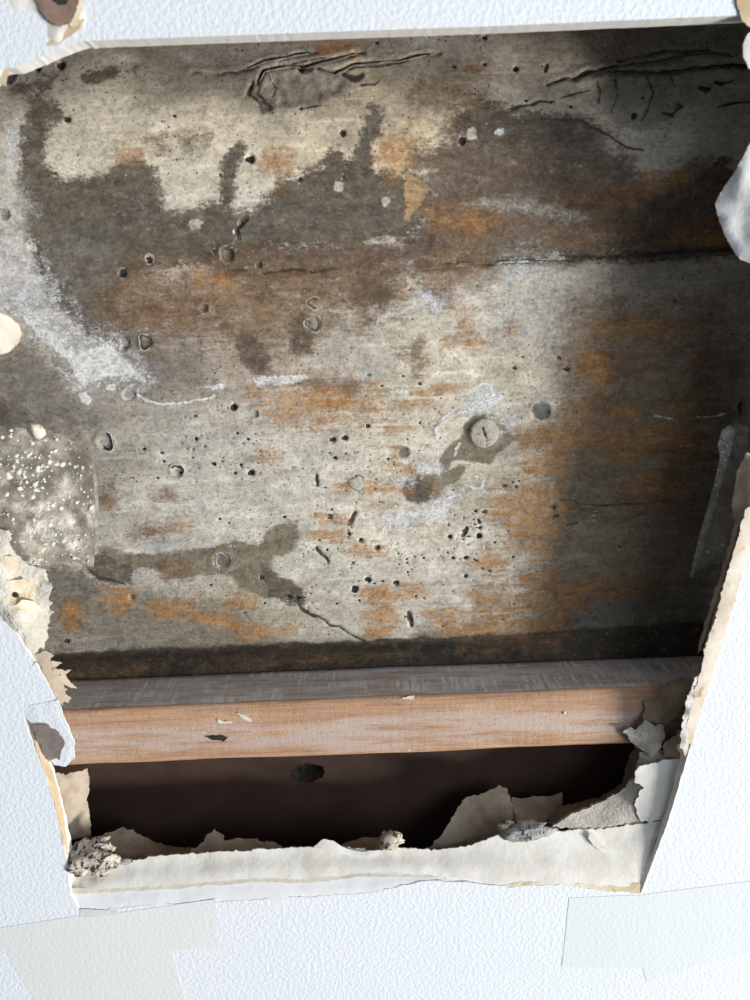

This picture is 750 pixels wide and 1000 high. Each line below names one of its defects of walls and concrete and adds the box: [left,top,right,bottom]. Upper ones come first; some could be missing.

leakage [80,65,138,85]
crack [193,52,429,105]
crack [498,49,750,152]
leakage [0,73,735,440]
leakage [378,381,516,533]
corrosion [129,523,191,538]
corrosion [309,513,389,558]
corrosion [423,469,652,641]
corrosion [97,584,305,641]
crack [280,594,365,641]
leakage [47,520,711,681]
corrosion [359,583,424,641]